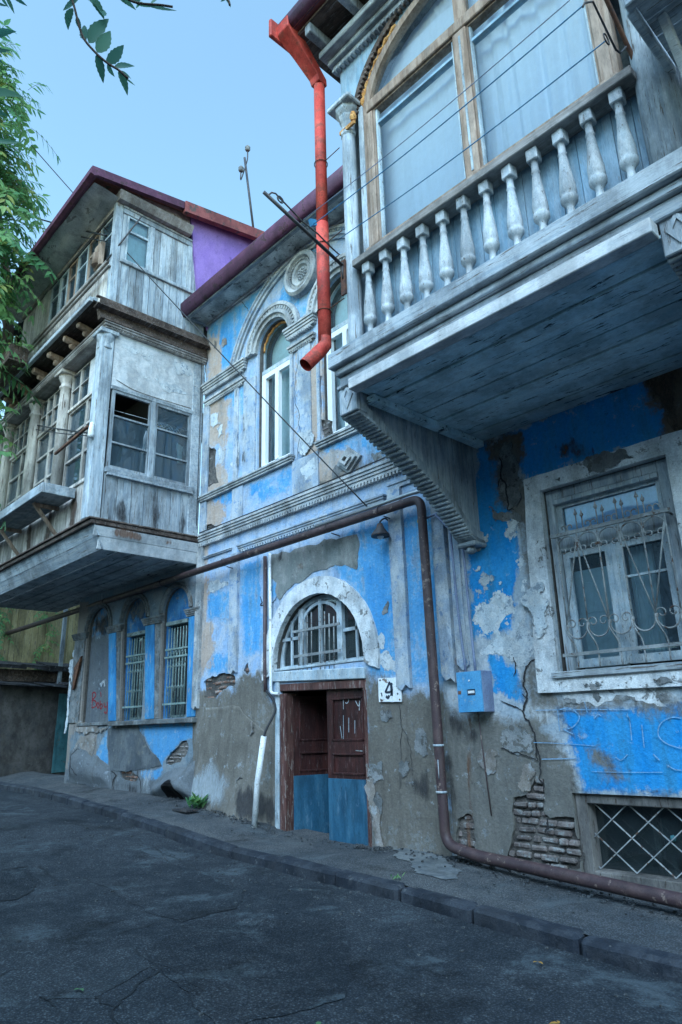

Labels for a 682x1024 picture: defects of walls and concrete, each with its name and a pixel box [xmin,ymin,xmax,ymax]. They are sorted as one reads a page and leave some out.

flaking render [202,413,240,487]
spalling [583,449,634,475]
spalling [271,534,360,600]
peeling [472,555,549,667]
spalling [64,650,189,782]
flaking render [206,664,249,698]
crack [501,657,544,791]
spalling [364,761,384,847]
flaking render [457,814,476,858]
flaking render [477,725,585,870]